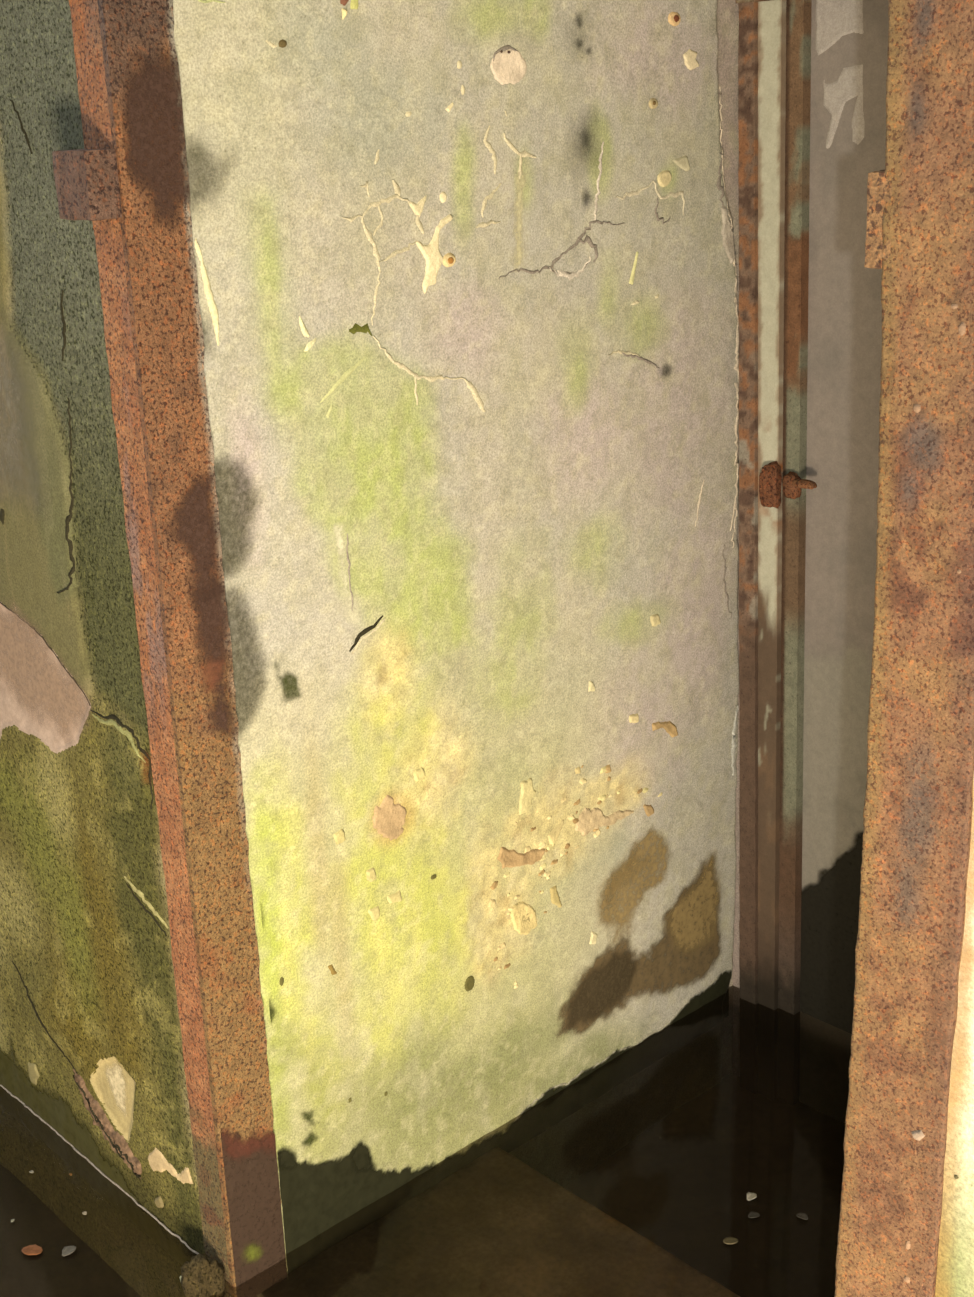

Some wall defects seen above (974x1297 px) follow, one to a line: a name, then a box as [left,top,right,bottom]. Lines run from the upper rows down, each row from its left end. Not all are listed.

flaking render [490,45,527,85]
crack [59,290,67,361]
crack [342,111,690,412]
crack [56,398,75,594]
crack [335,527,385,654]
flaking render [0,602,91,754]
peeling [488,765,662,989]
flaking render [464,975,475,992]
leakage [0,1039,192,1266]
flaking render [90,1056,136,1143]
flaking render [148,1148,193,1184]
leakage [221,831,732,1297]